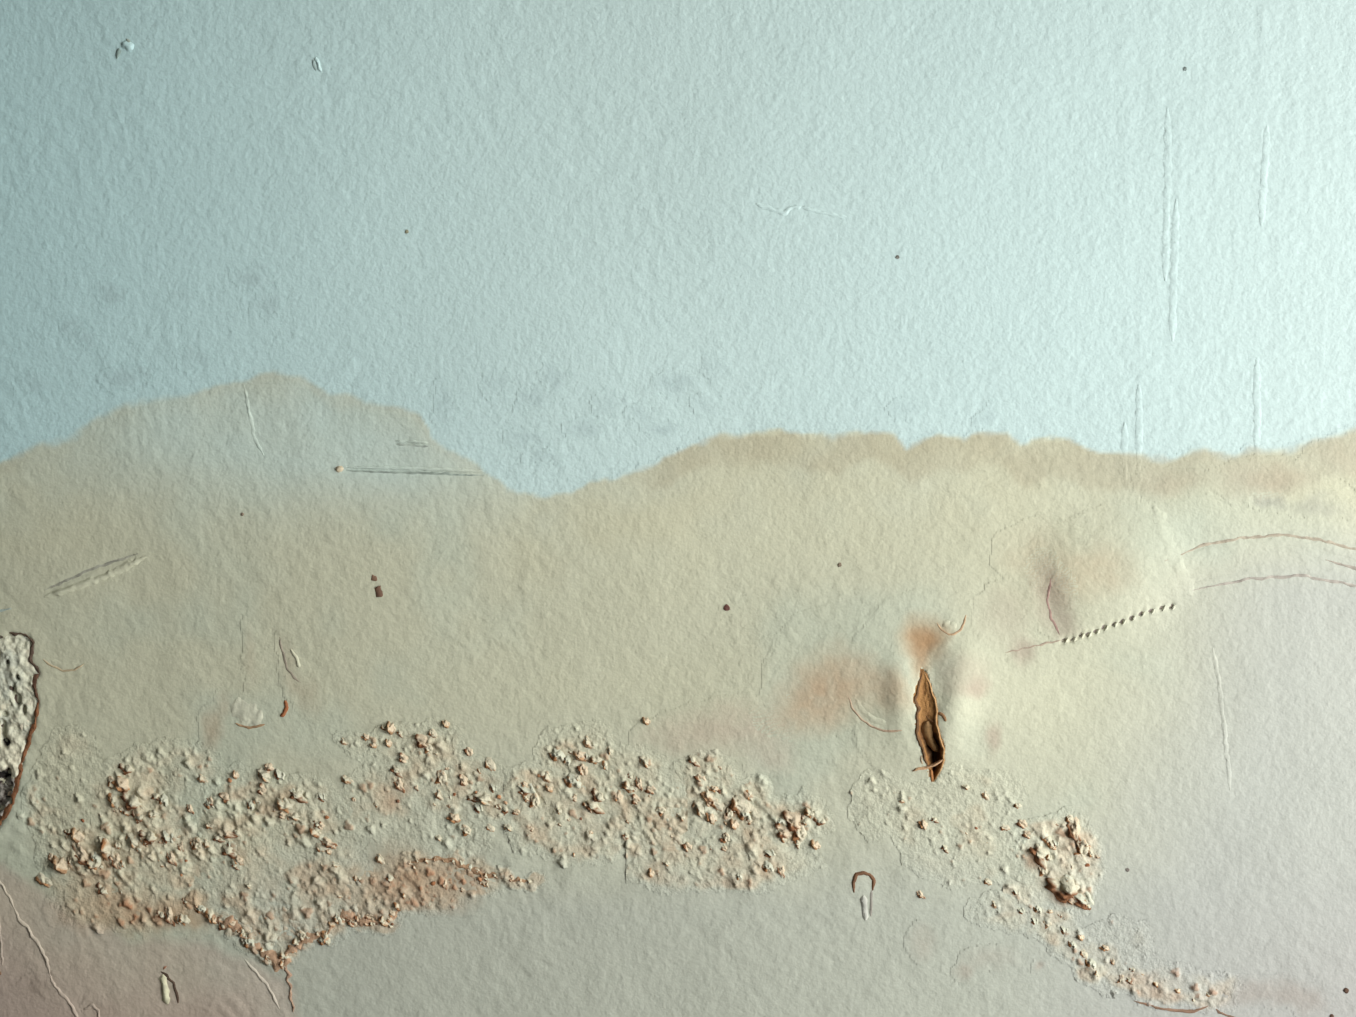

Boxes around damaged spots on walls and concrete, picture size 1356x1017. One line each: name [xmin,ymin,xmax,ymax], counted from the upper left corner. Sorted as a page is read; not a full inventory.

spalling [0,632,1246,1016]
leakage [0,344,1356,1017]
corrosion [749,606,959,744]